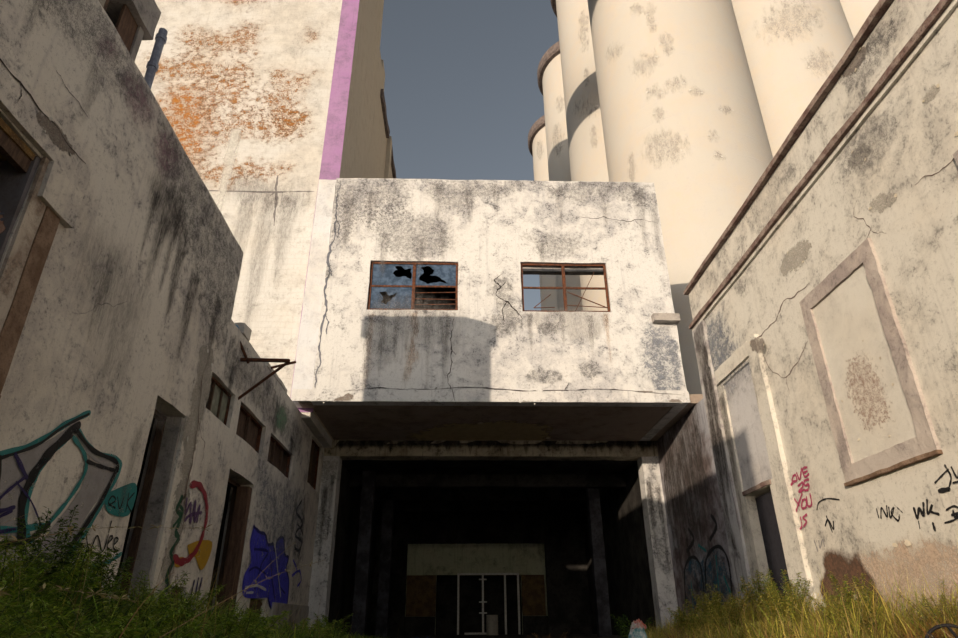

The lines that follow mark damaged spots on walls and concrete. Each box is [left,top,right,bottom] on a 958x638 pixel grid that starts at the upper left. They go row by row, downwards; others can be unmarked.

crack [0,59,86,164]
rust [156,23,316,190]
crack [208,175,314,226]
damp [142,129,301,467]
crack [314,181,341,387]
crack [494,276,522,320]
crack [348,319,679,403]
damp [820,552,886,616]